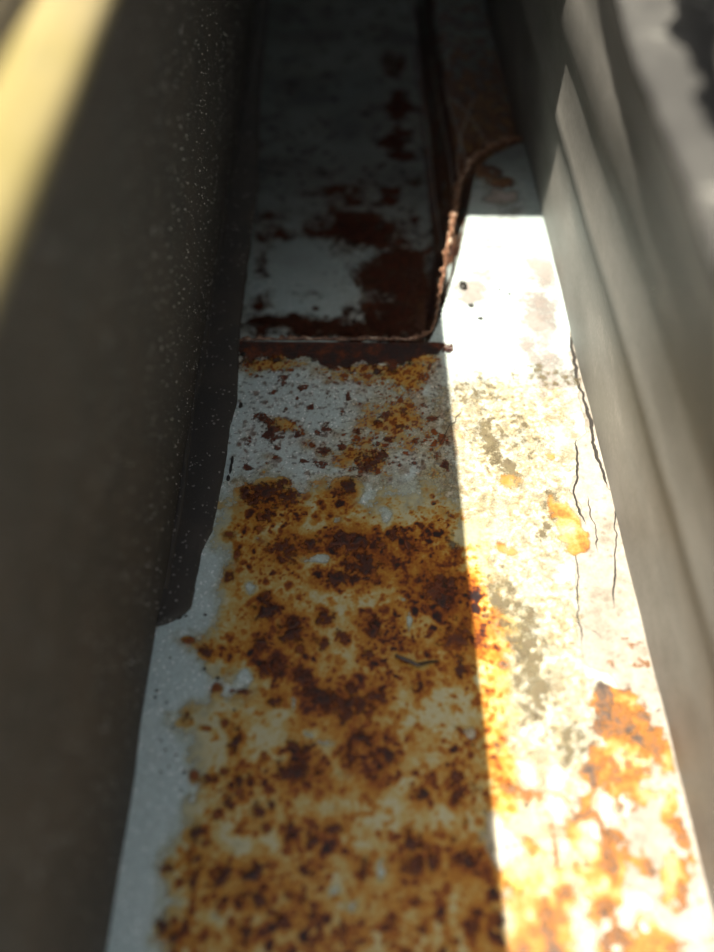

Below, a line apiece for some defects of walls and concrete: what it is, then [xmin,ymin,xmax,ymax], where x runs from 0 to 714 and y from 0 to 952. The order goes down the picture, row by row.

rust [151,0,696,952]
crack [569,332,618,646]